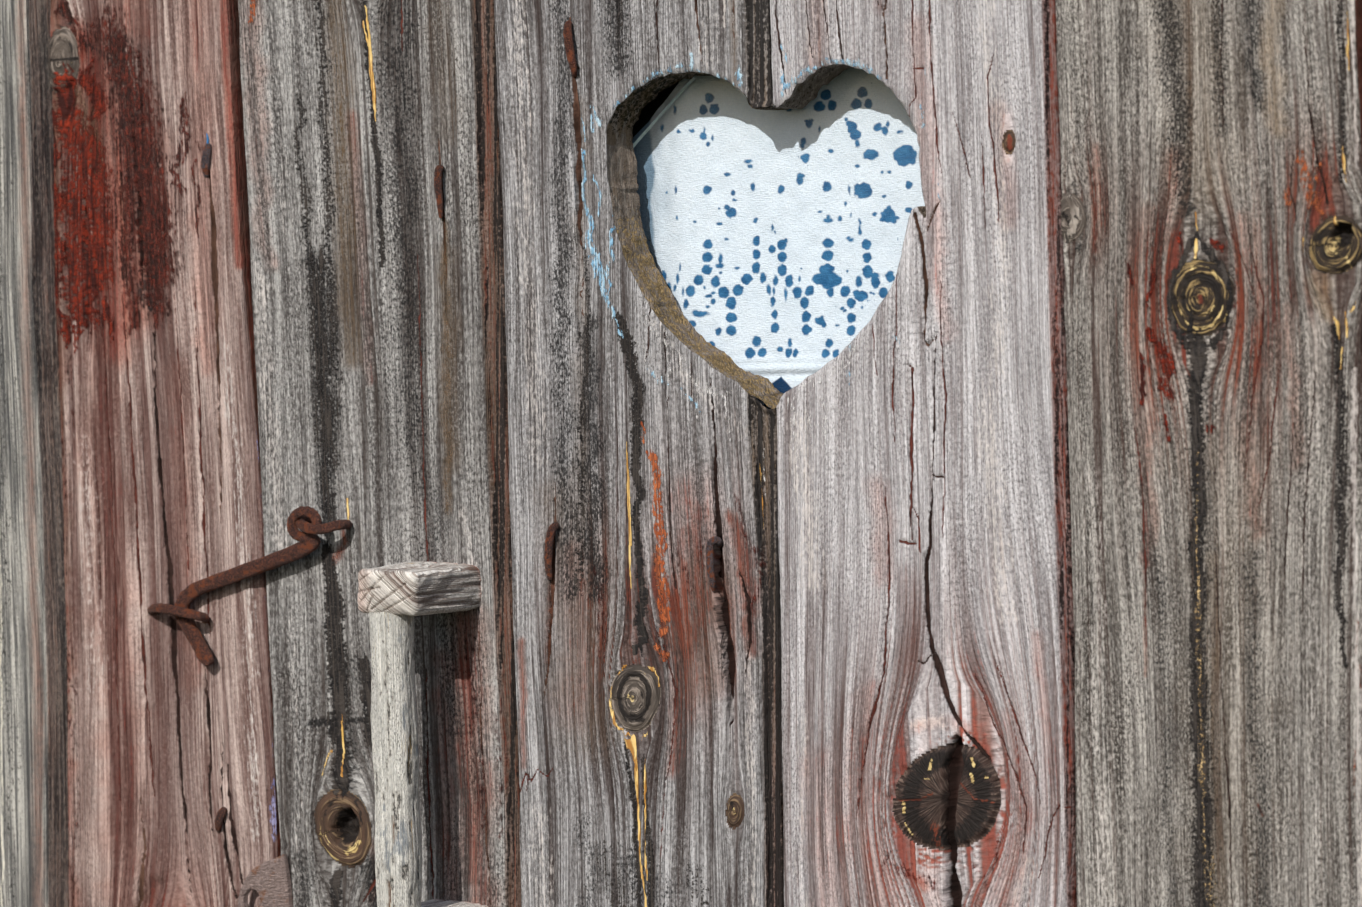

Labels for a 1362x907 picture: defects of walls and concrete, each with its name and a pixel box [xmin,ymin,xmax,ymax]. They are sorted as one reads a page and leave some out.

crack [653,0,661,72]
crack [694,0,704,69]
crack [775,0,844,93]
crack [645,308,752,729]
crack [856,0,1071,907]
crack [660,644,678,861]